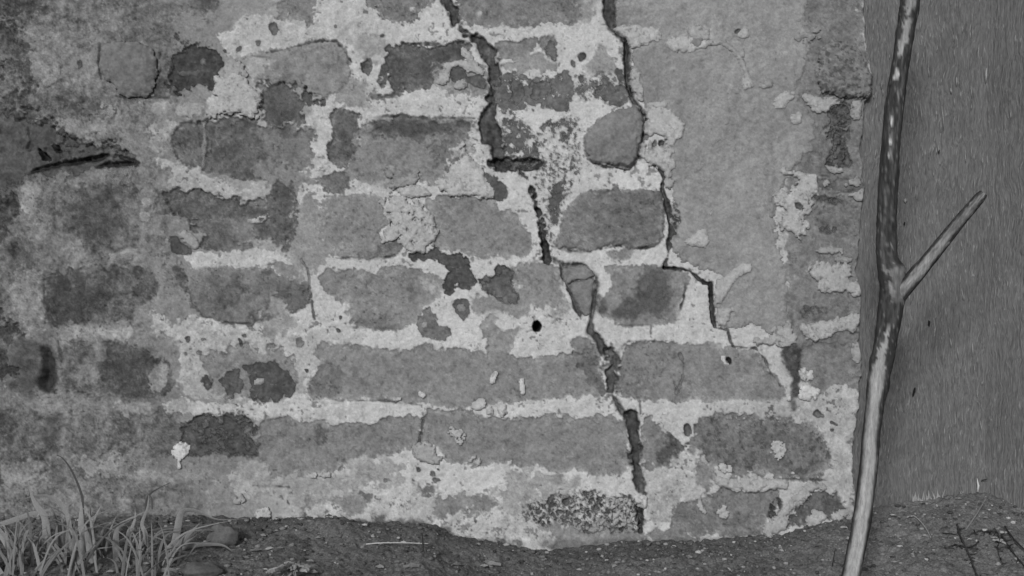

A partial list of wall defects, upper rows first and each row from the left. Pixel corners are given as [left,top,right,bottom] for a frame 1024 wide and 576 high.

flaking render [164,32,263,120]
flaking render [378,141,519,321]
crack [440,0,647,534]
peeling [436,40,685,242]
crack [602,0,780,386]
flaking render [613,23,865,297]
peeling [416,306,451,341]
flaking render [753,305,861,363]
peeling [200,360,296,403]
spalling [171,412,261,469]
spalling [522,489,647,534]
flaking render [715,463,853,537]